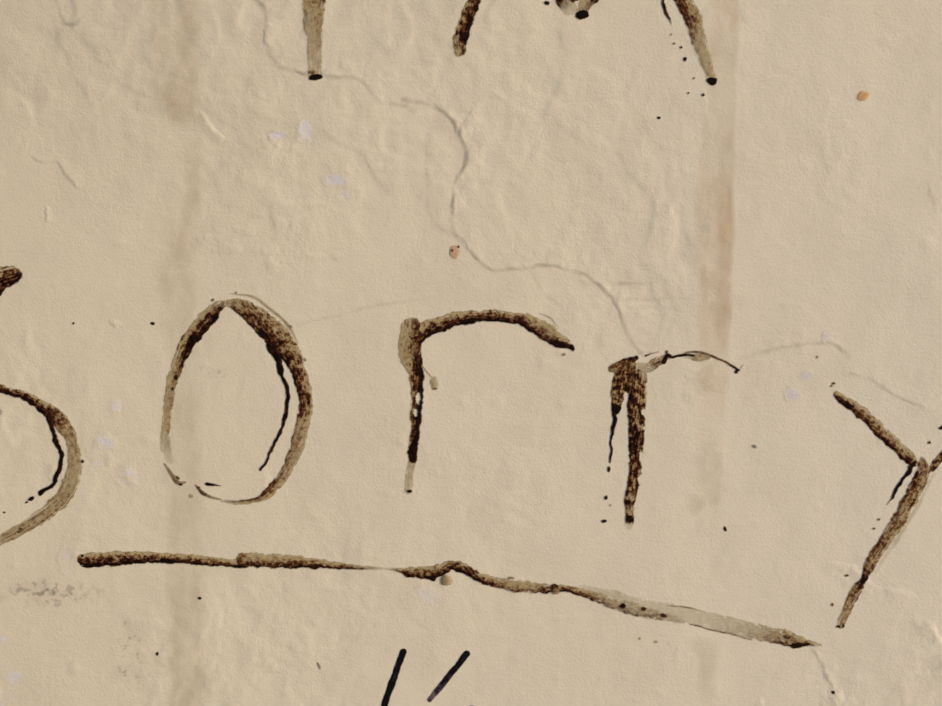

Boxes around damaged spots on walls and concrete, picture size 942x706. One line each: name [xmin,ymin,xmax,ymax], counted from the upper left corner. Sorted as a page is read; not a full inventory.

crack [254,0,644,335]